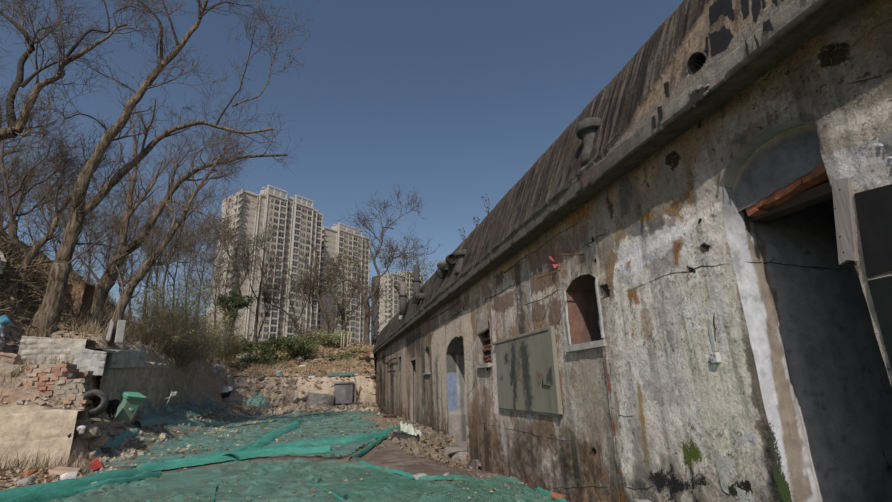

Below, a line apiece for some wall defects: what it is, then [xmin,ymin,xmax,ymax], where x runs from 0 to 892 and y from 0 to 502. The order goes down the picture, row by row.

spalling [816,42,850,67]
spalling [665,150,680,171]
crack [629,258,845,291]
leakage [511,262,533,415]
leakage [624,465,707,502]
leakage [721,480,753,500]